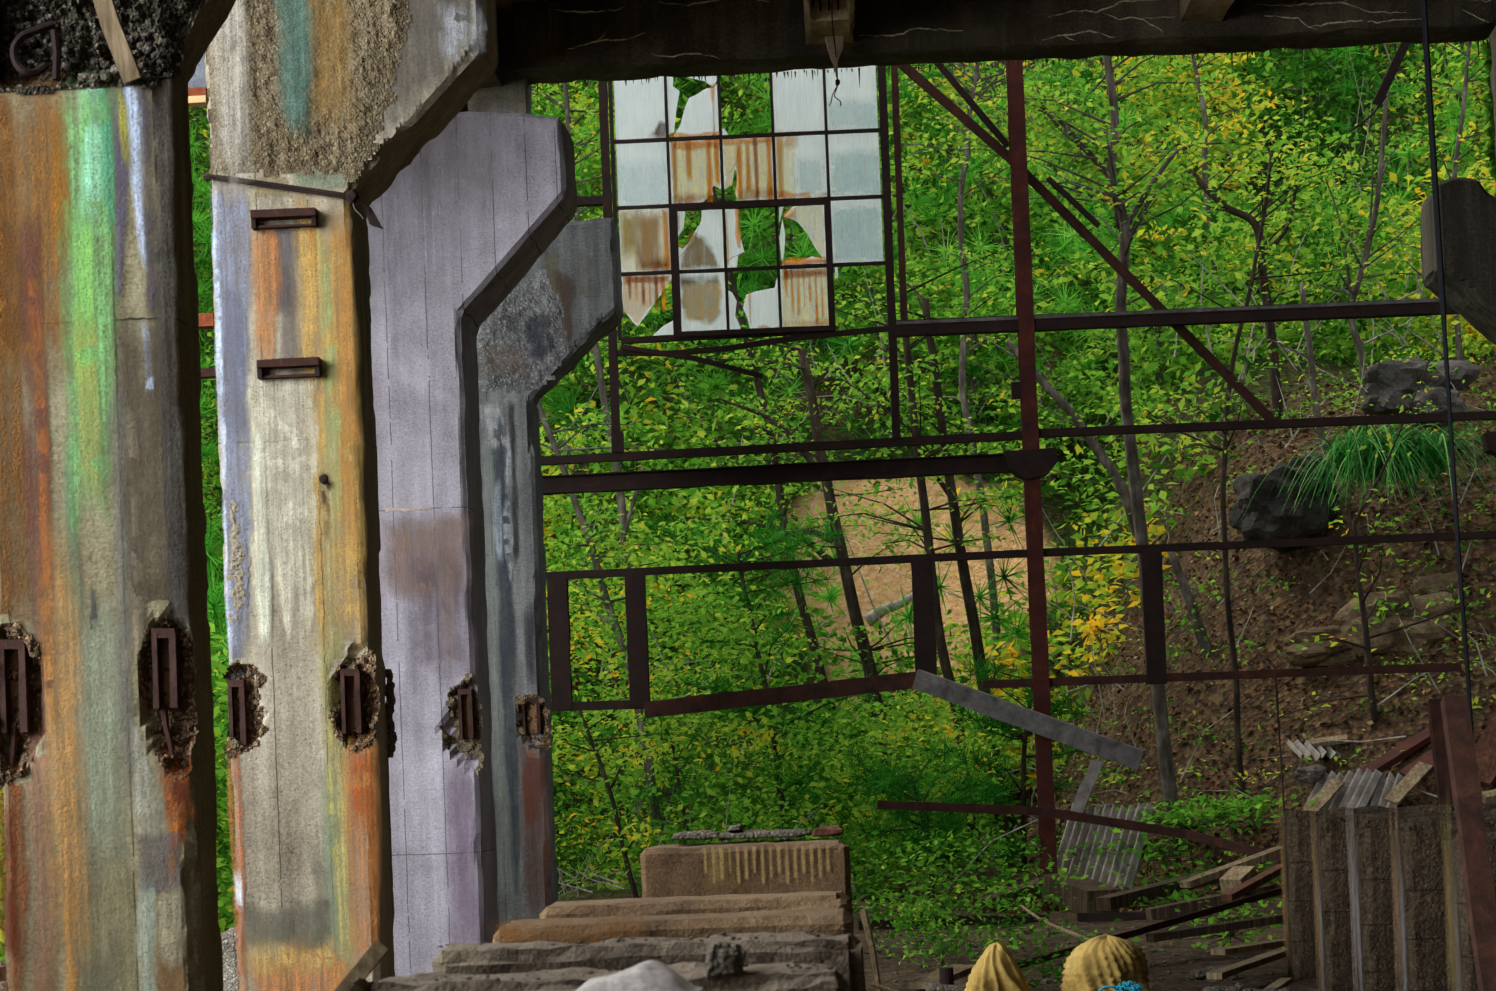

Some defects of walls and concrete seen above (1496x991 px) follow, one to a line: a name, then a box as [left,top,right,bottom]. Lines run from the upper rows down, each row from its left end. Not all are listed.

damp [218,0,241,142]
damp [275,0,345,127]
crack [1042,0,1163,41]
crack [1254,0,1422,29]
corrosion [254,219,360,658]
corrosion [0,98,78,991]
damp [66,84,194,991]
spalling [0,622,43,789]
spalling [138,619,199,780]
spalling [223,663,267,759]
spalling [328,650,397,758]
corrosion [162,748,191,871]